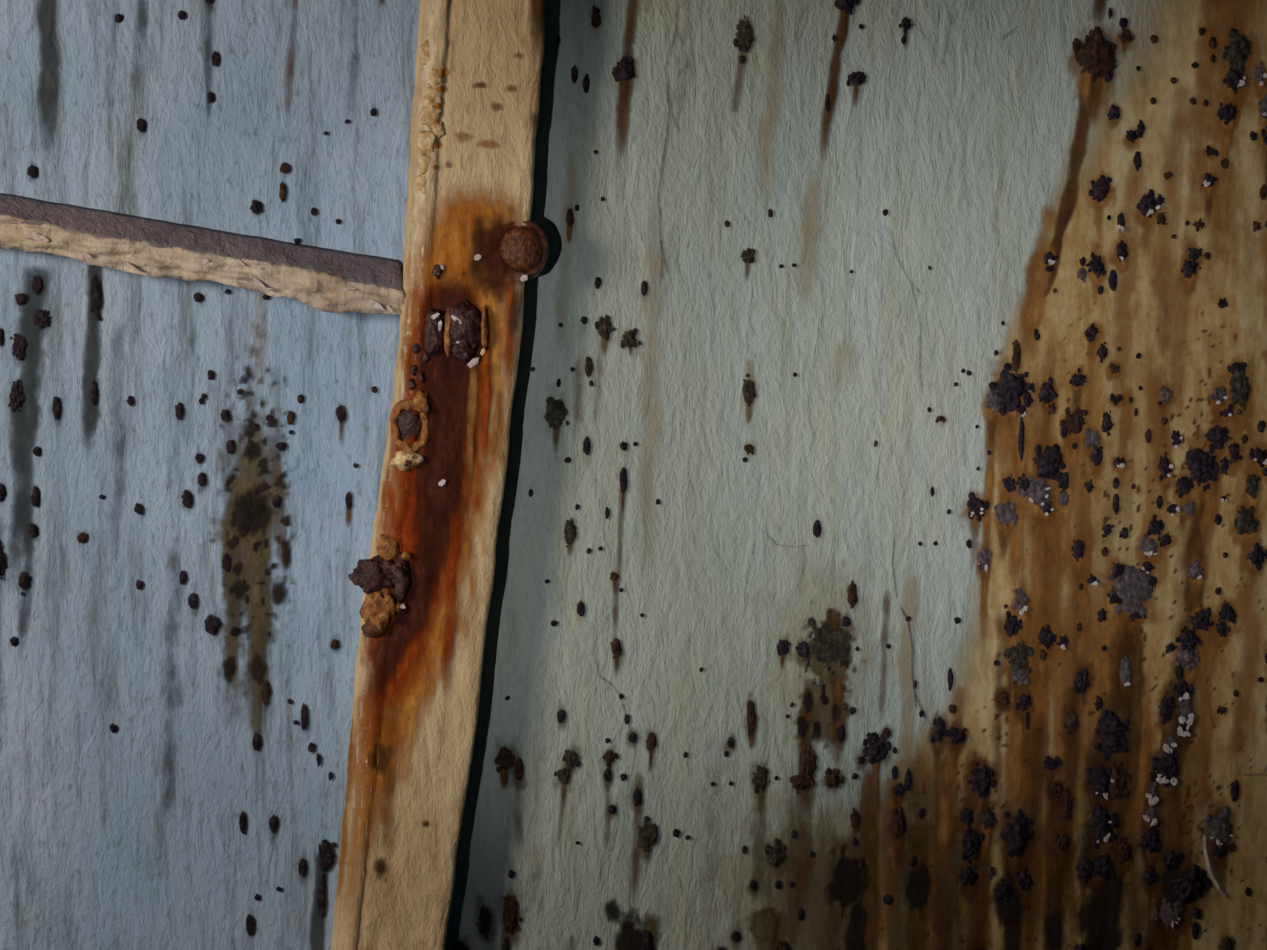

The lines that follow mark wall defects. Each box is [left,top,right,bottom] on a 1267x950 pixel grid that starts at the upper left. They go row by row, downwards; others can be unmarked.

rust [612,0,637,144]
rust [308,193,523,918]
rust [742,0,1267,950]